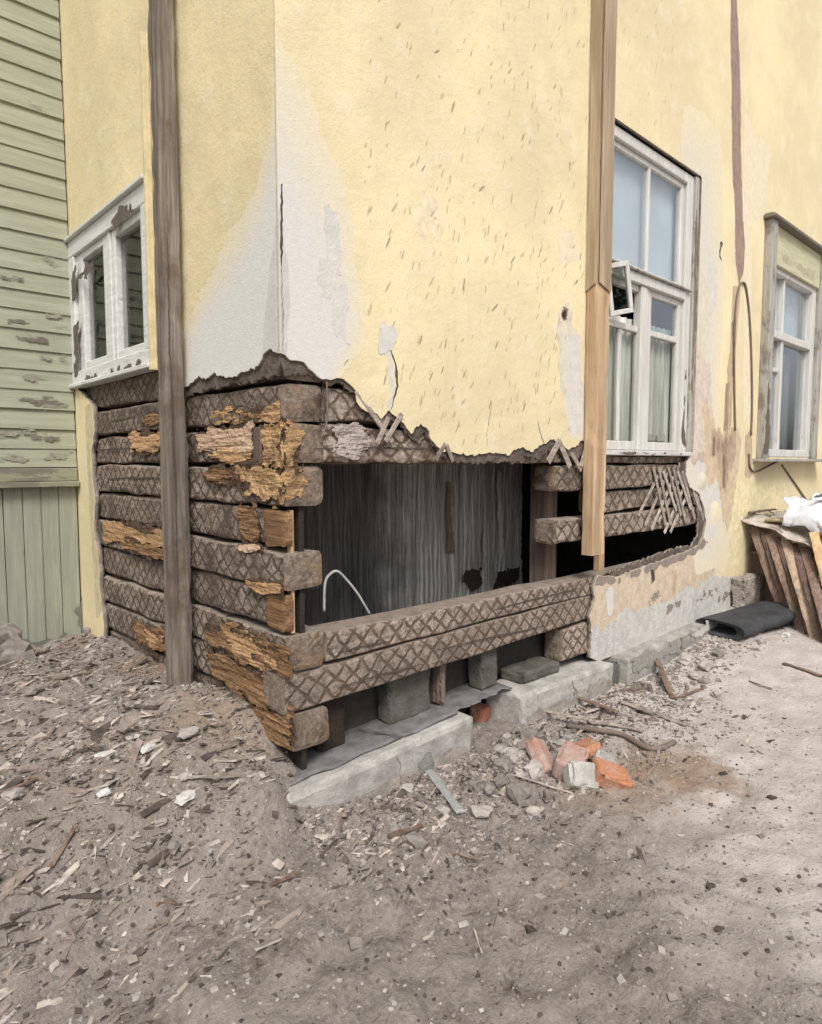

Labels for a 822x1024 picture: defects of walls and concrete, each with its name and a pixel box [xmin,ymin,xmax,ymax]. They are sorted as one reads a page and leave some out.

peeling [111,203,133,229]
peeling [71,260,93,301]
crack [278,184,286,351]
leakage [702,0,752,531]
peeling [16,312,141,380]
spalling [378,321,584,465]
spalling [332,422,372,460]
spalling [195,400,310,553]
spalling [245,577,284,598]
spalling [463,567,519,591]
spalling [204,613,299,756]